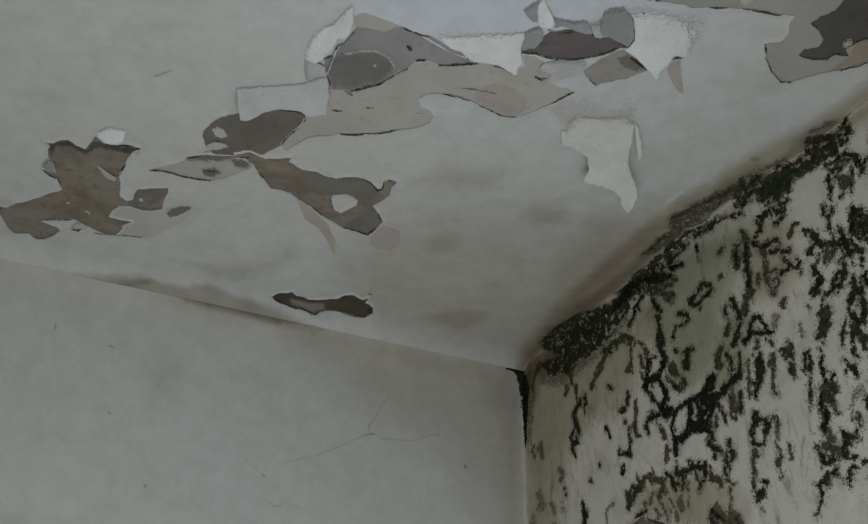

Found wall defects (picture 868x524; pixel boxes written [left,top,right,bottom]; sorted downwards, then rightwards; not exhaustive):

peeling [0,0,868,254]
peeling [268,289,376,320]
mould [506,114,868,524]